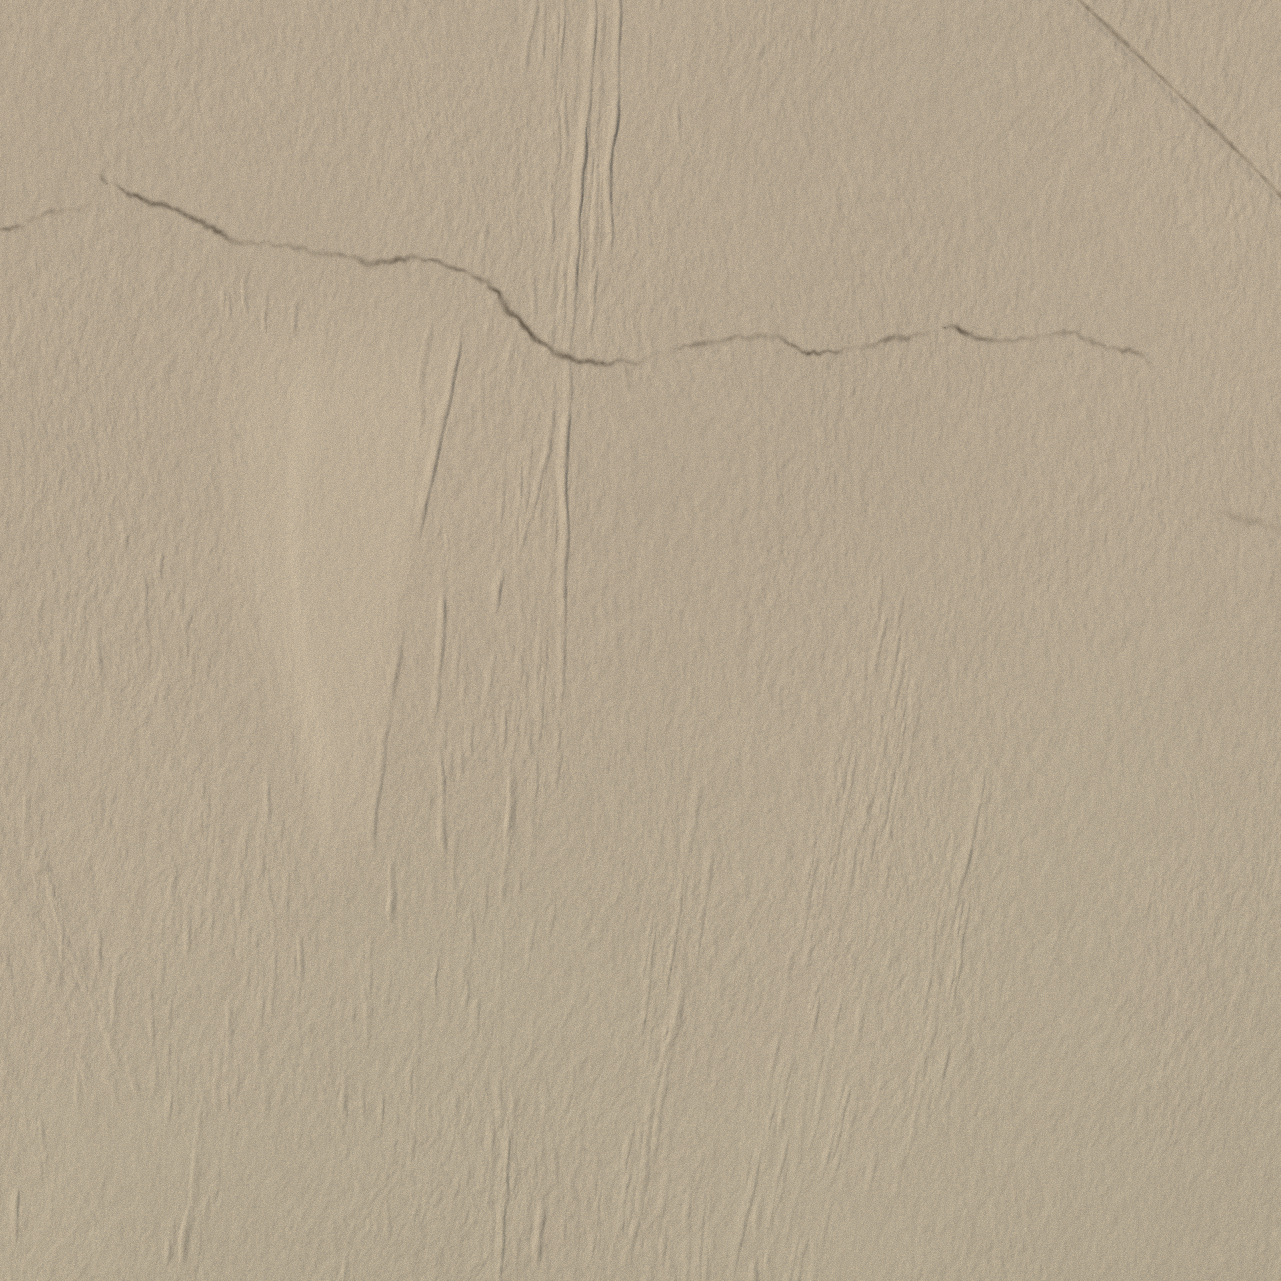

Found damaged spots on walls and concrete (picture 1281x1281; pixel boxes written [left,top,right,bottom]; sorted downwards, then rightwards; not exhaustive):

crack [0,172,1154,390]